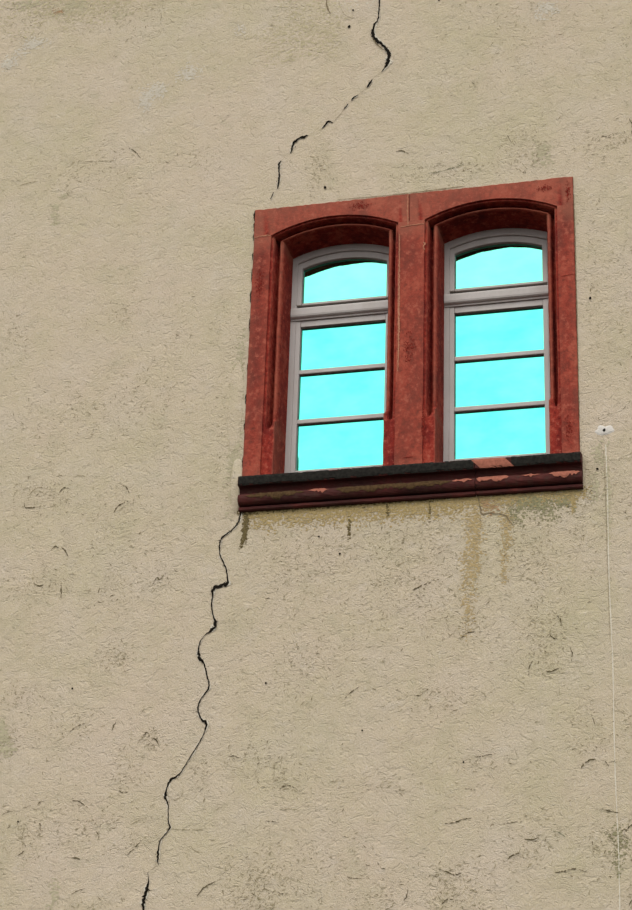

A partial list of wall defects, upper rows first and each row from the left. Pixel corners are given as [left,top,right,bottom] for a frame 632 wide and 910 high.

crack [249,0,393,325]
spalling [453,457,513,482]
spalling [549,470,580,478]
damp [237,485,593,642]
crack [129,512,242,910]